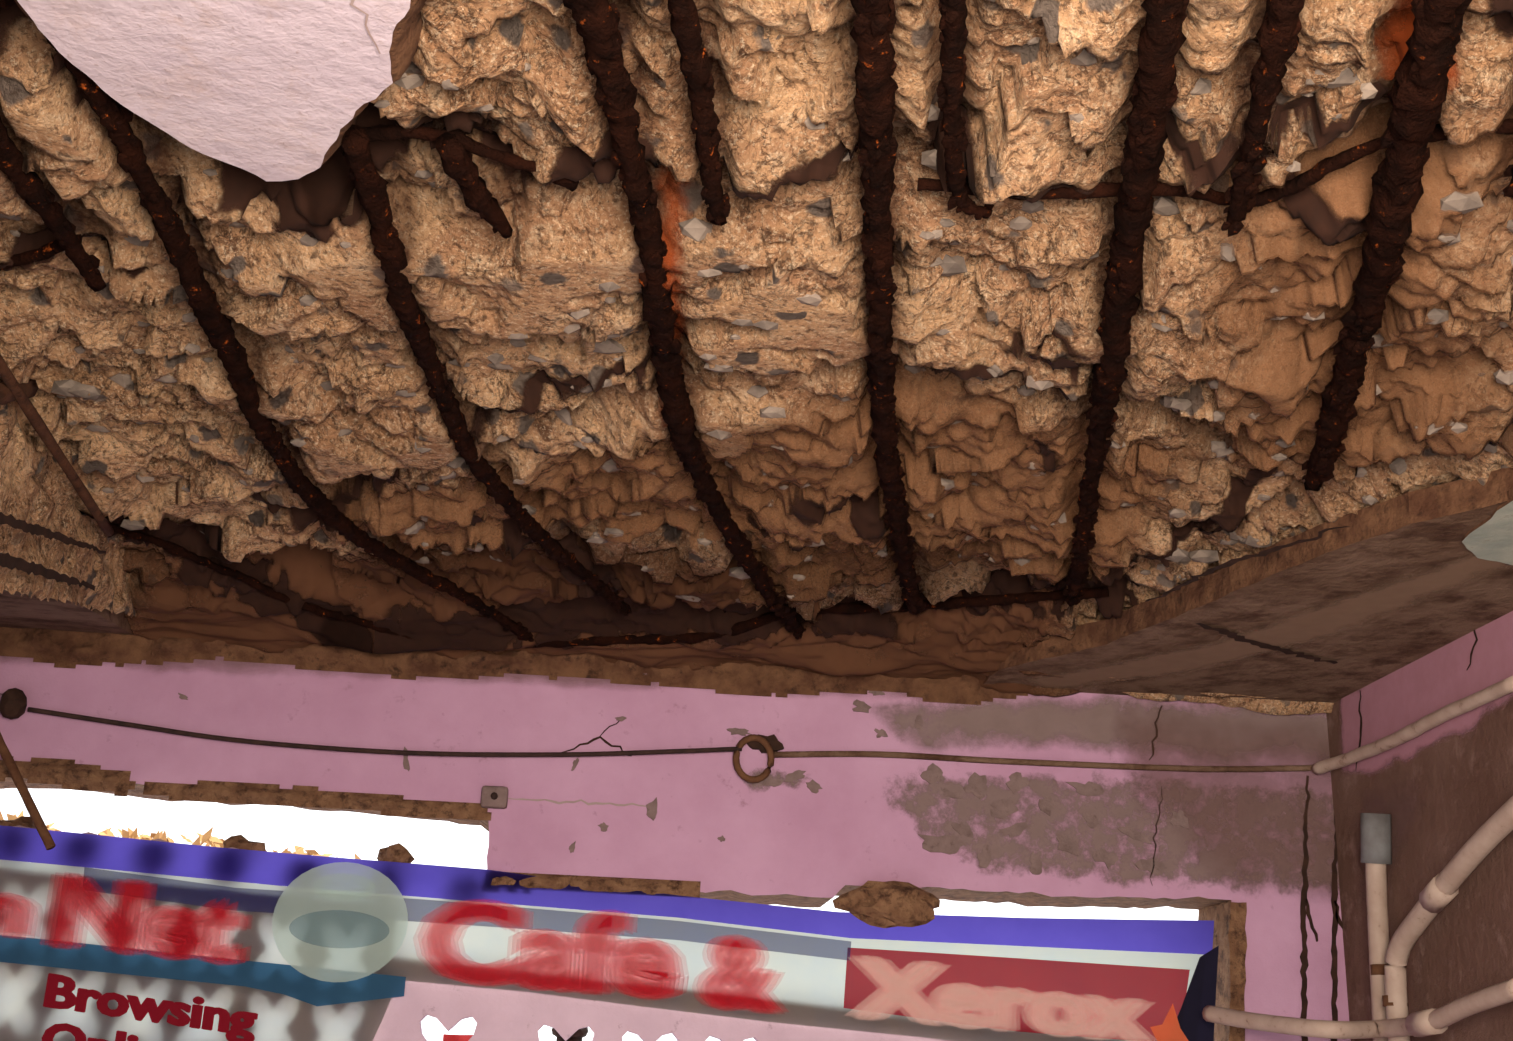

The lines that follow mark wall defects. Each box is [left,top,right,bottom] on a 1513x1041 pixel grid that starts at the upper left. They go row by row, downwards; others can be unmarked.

corrosion [1377,0,1415,80]
crack [926,103,1100,203]
crack [1165,81,1389,246]
corrosion [662,170,684,339]
crack [469,325,689,444]
spalling [0,0,1513,773]
crack [0,455,1348,654]
spalling [0,756,492,821]
crack [563,721,631,756]
peeling [646,797,657,821]
peeling [747,770,823,793]
crack [1300,776,1343,1041]